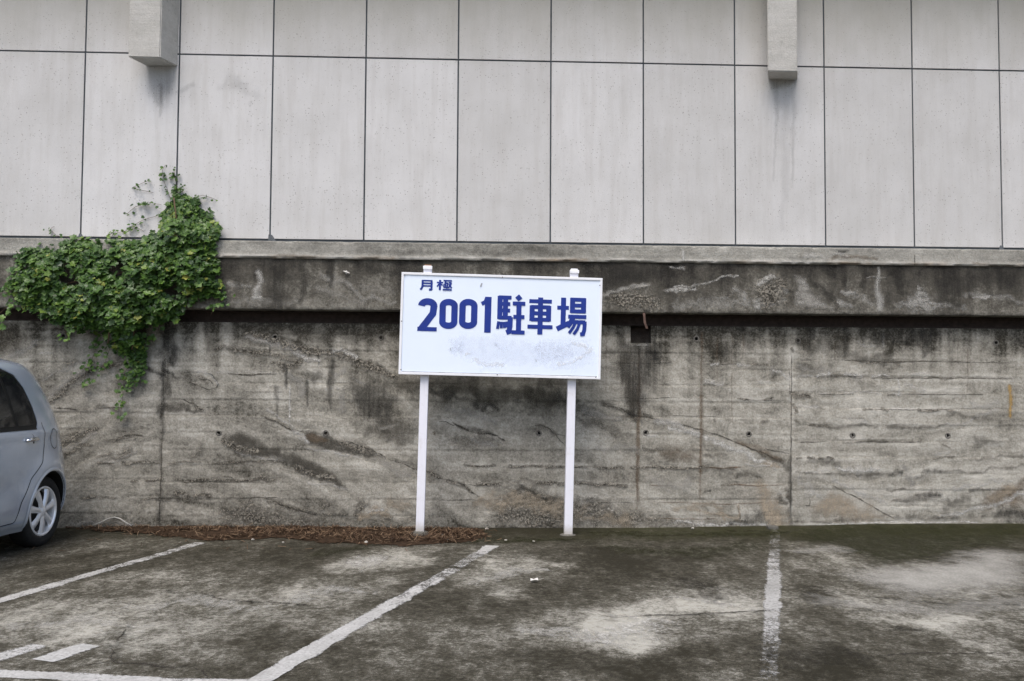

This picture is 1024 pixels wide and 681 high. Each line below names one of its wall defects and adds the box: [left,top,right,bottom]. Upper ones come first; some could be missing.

water stain [620,338,661,421]
crack [806,481,892,521]